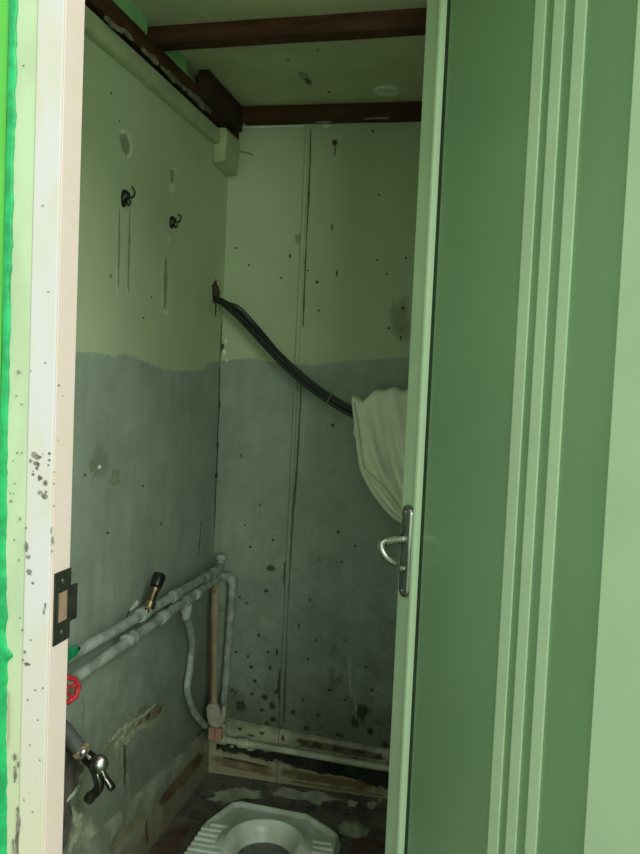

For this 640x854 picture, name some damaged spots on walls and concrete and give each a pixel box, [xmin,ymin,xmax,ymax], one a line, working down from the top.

water stain [234,651,278,725]
peeling [99,693,163,767]
water stain [216,744,389,789]